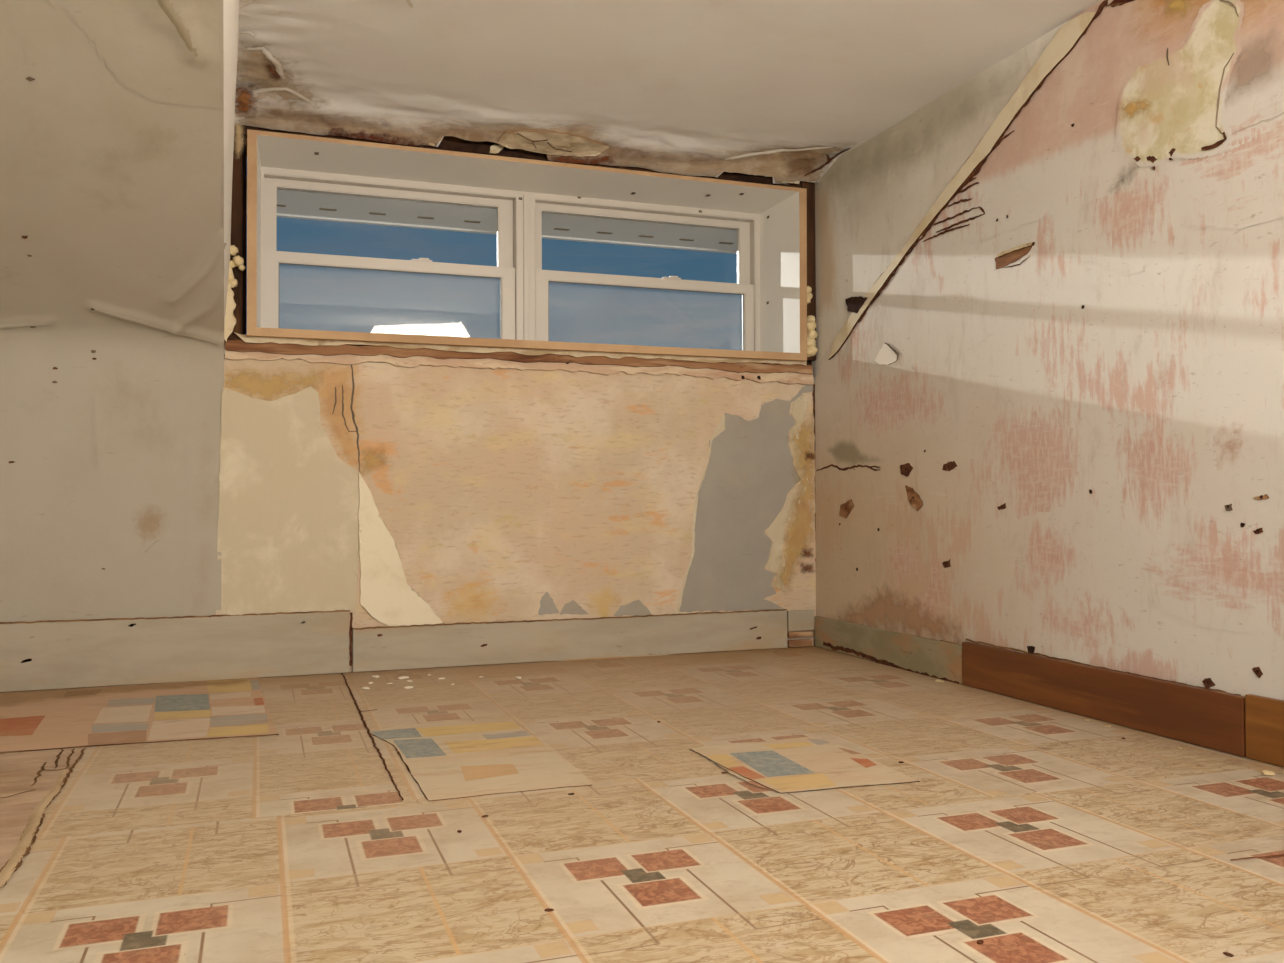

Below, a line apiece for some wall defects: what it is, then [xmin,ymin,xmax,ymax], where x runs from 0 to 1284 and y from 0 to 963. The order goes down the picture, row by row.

flaking render [424,142,535,160]
water stain [236,46,846,330]
flaking render [973,60,1284,276]
flaking render [845,296,867,313]
crack [332,365,360,472]
flaking render [676,378,815,612]
crack [816,463,880,471]
peeling [851,343,961,640]
flaking render [538,592,588,615]